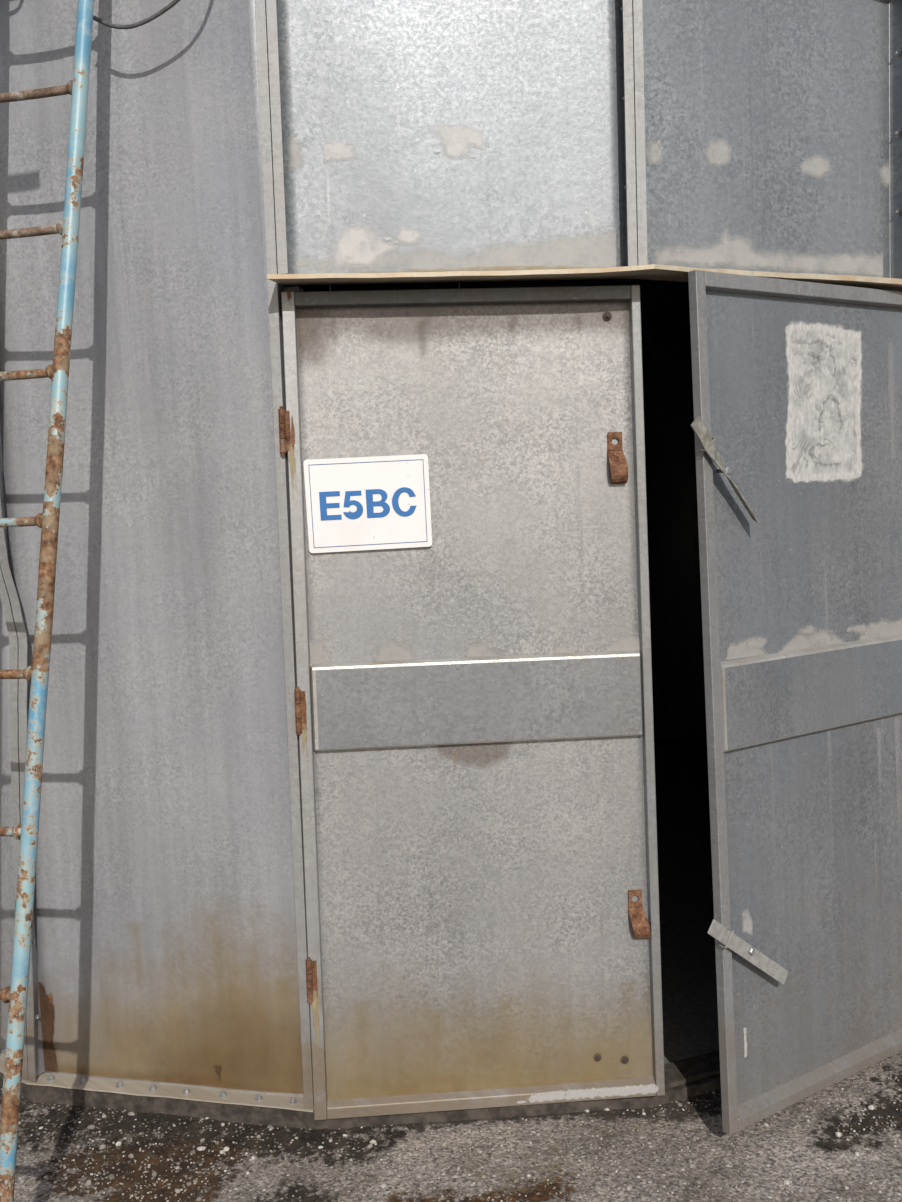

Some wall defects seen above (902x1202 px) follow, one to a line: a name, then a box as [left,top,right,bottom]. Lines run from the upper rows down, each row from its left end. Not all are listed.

peeling [336,227,420,264]
rust [38,982,58,1073]
leakage [169,1009,303,1093]
leakage [326,1031,544,1099]
leakage [582,1030,652,1081]
leakage [17,1088,722,1166]